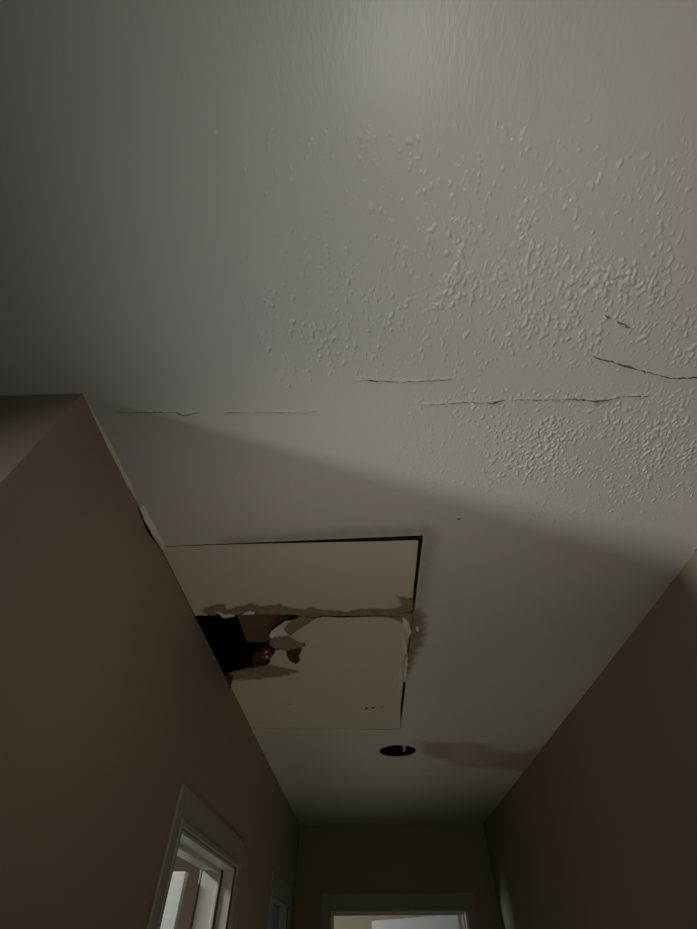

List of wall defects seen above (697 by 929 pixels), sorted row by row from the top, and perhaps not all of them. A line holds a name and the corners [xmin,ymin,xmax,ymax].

crack [352,354,697,408]
peeling [286,643,305,664]